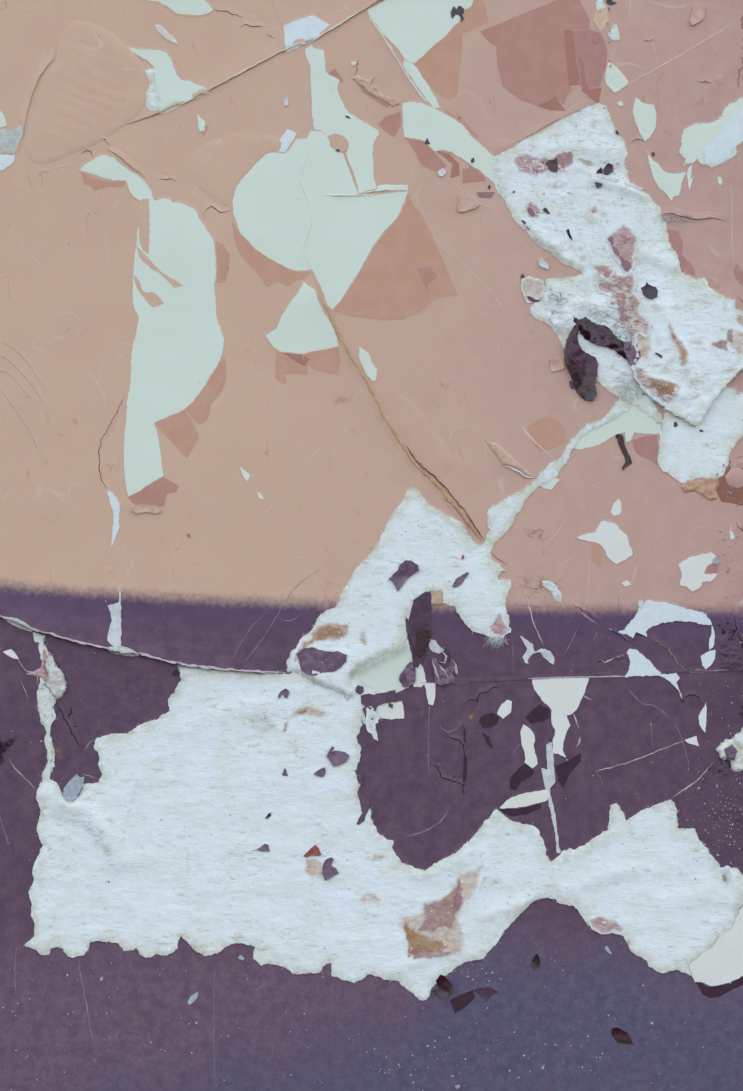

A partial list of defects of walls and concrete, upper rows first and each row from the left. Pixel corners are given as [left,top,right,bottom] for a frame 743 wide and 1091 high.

crack [214,6,273,38]
peeling [231,0,515,354]
peeling [595,60,695,202]
peeling [77,153,226,549]
peeling [549,313,641,401]
crack [405,445,484,539]
peeling [389,560,419,591]
peeling [296,647,347,676]
peeling [353,592,458,720]
peeling [607,598,716,700]
peeling [496,635,590,854]
peeling [689,906,743,986]